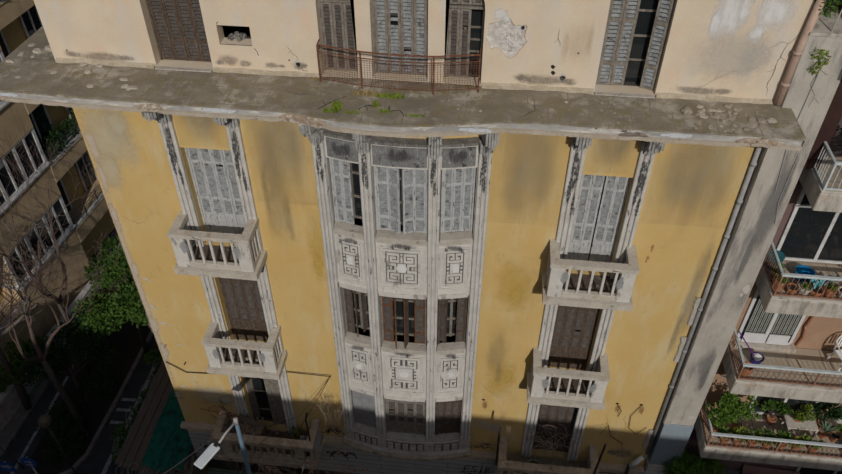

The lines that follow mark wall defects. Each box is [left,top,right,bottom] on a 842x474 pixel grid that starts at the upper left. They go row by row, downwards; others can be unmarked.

flaking render [486,18,527,58]
crack [687,32,801,94]
spalling [279,113,326,129]